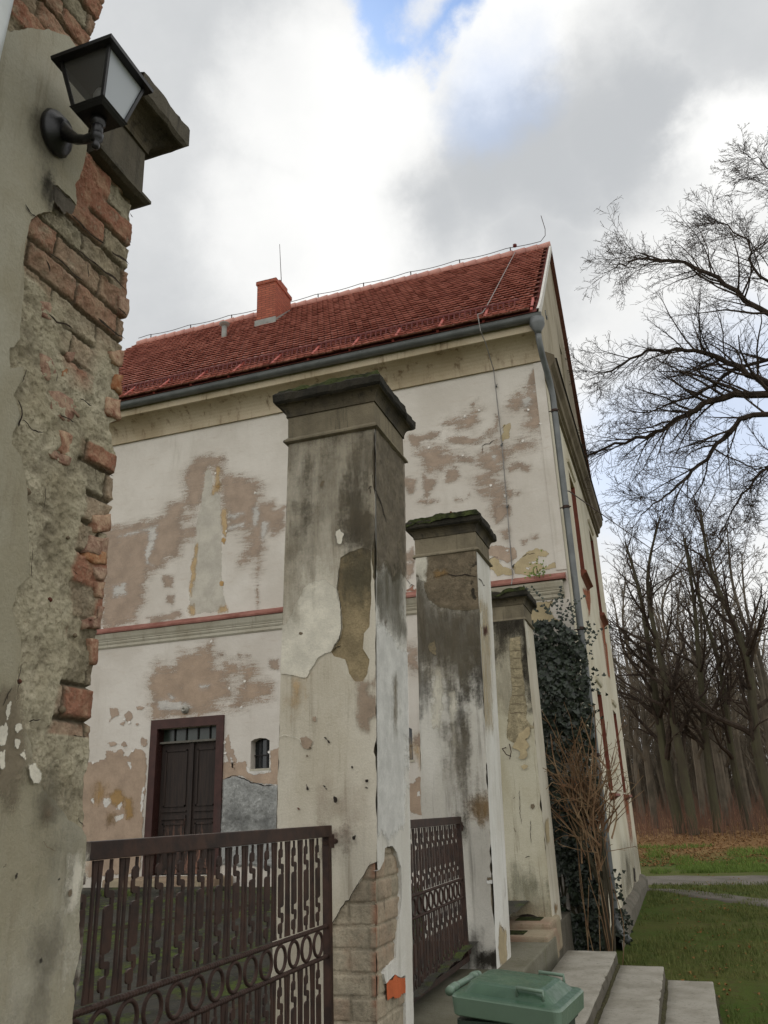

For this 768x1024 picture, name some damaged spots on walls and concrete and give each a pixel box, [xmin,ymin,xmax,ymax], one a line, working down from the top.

peeling [85,856,141,878]
flaking render [0,151,287,841]
peeling [109,370,560,1024]
leakage [377,569,482,774]